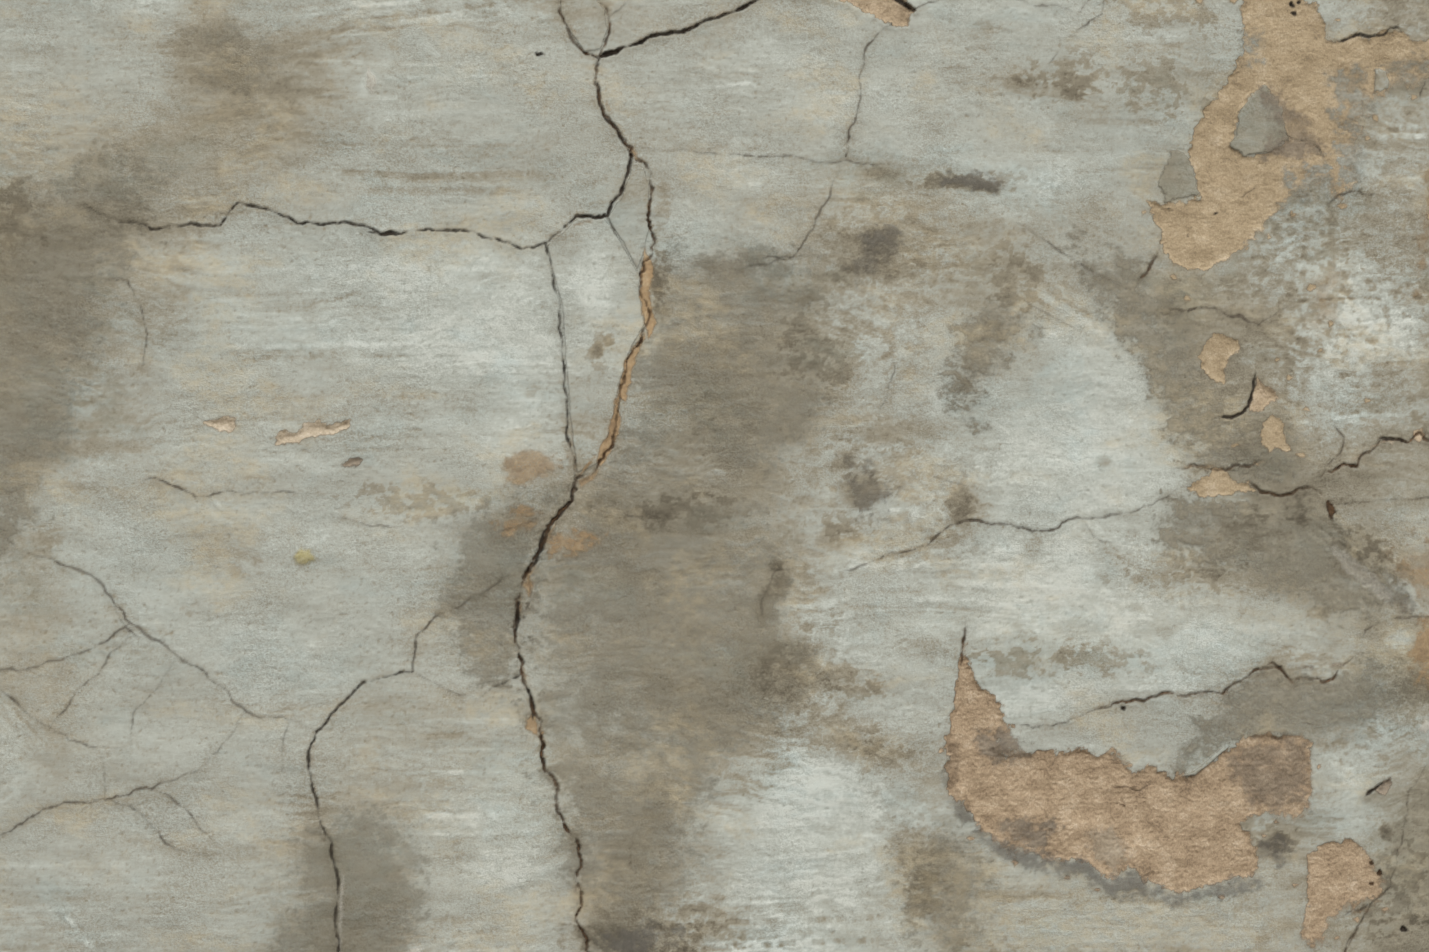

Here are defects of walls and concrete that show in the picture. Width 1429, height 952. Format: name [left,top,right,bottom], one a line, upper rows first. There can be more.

flaking render [1142,0,1429,279]
damp [0,149,162,551]
crack [120,0,756,952]
damp [939,293,1043,435]
flaking render [1222,377,1305,457]
crack [1186,428,1428,497]
crack [9,783,193,832]
damp [436,497,556,688]
damp [534,422,803,952]
flaking render [939,630,1321,899]
crack [1099,662,1337,709]
flaking render [1292,839,1388,948]